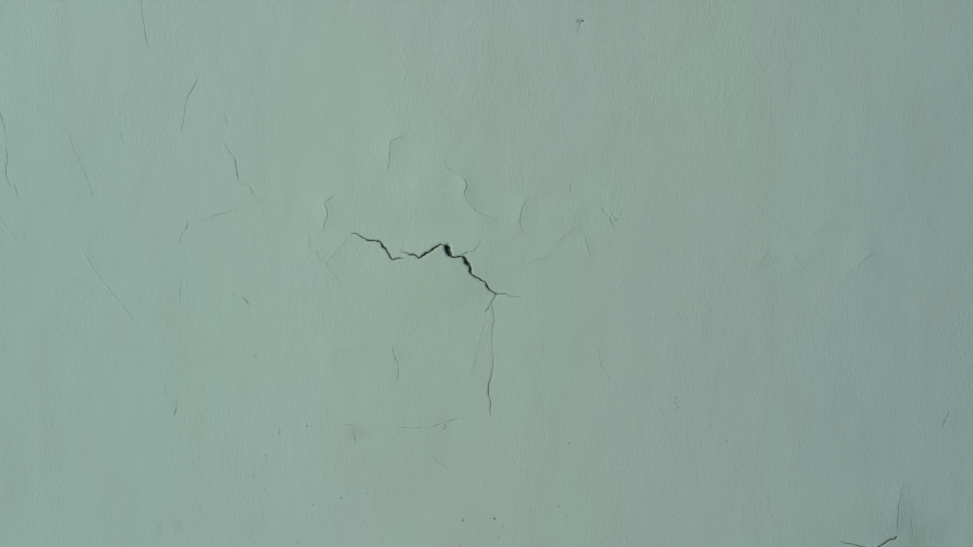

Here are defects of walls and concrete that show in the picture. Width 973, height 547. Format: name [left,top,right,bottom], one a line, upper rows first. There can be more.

crack [354,233,522,329]